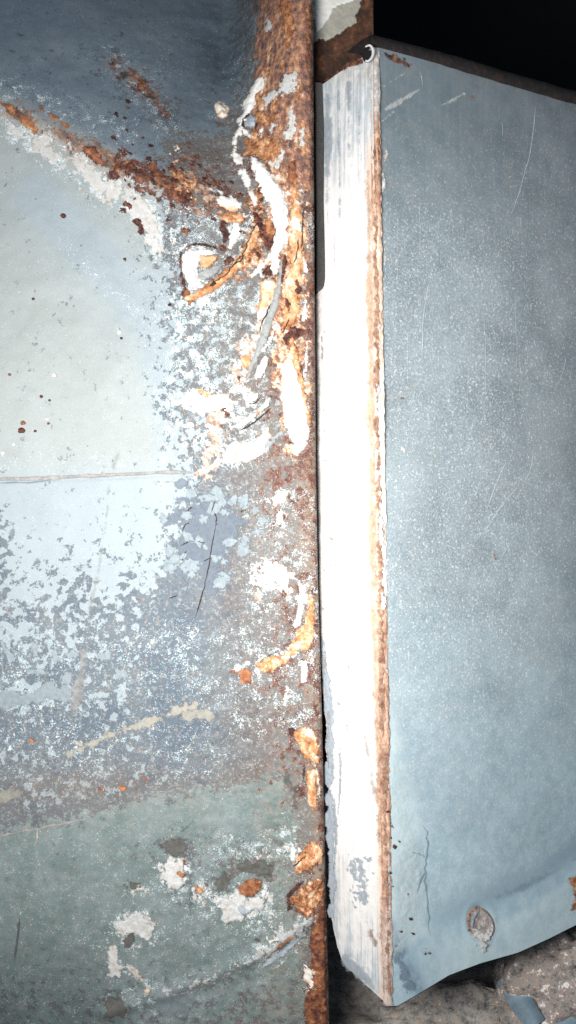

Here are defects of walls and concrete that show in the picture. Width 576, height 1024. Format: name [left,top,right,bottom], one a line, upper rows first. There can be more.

rust [0,103,39,135]
rust [82,0,363,485]
peeling [185,337,312,476]
crack [195,513,217,616]
peeling [160,485,306,628]
rust [364,129,415,997]
rust [229,594,316,684]
rust [288,726,322,808]
peeling [123,882,149,894]
spalling [107,910,194,1017]
spalling [157,839,278,928]
rust [286,842,328,1024]